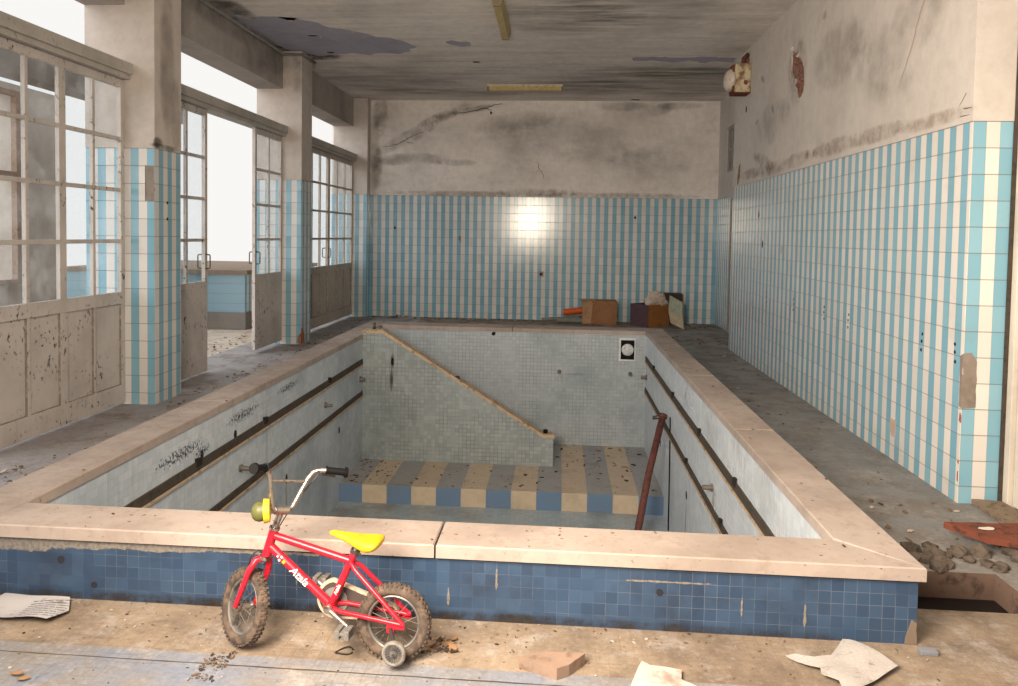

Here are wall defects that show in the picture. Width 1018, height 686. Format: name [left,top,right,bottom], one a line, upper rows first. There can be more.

peeling [230,15,418,56]
peeling [632,52,750,63]
spalling [789,47,804,103]
peeling [958,353,977,423]
peeling [0,537,262,564]